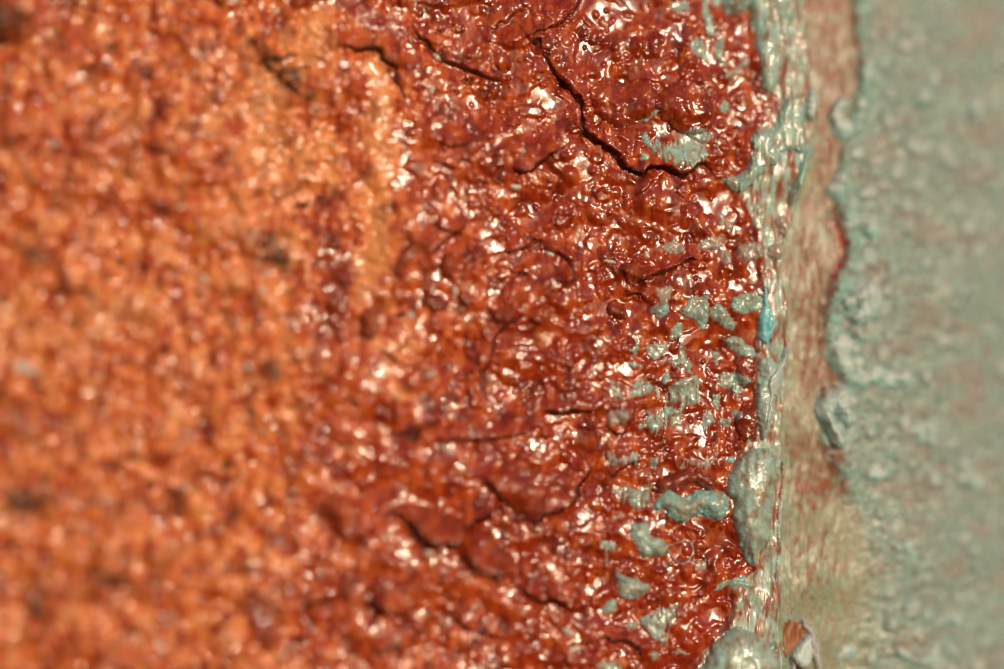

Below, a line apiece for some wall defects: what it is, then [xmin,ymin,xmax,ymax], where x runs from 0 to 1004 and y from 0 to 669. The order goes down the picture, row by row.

crack [343,43,406,98]
crack [414,31,501,83]
crack [494,0,715,179]
peeling [805,85,819,122]
peeling [787,145,812,206]
crack [505,211,575,289]
rust [799,208,851,397]
crack [479,314,524,405]
crack [387,404,637,442]
crack [421,461,636,639]
spalling [665,591,728,662]
peeling [783,618,823,669]